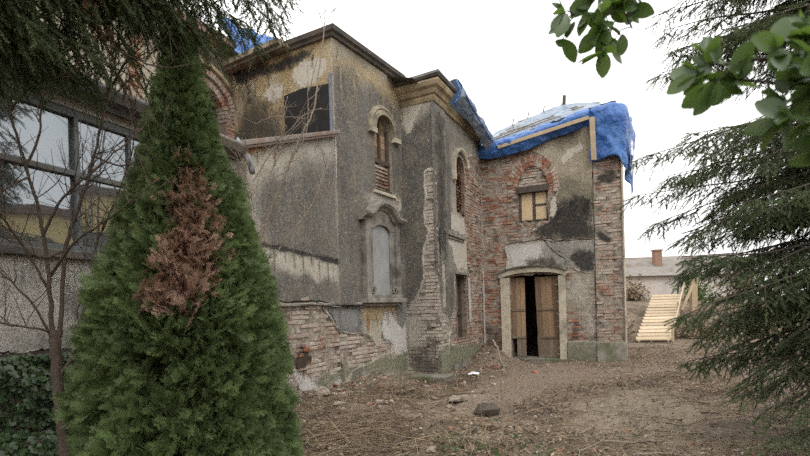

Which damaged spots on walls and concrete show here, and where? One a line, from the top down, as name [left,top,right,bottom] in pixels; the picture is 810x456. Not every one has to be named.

water stain [234,51,313,140]
peeling [263,56,328,104]
water stain [534,196,611,242]
spalling [276,137,624,393]
water stain [570,250,594,271]